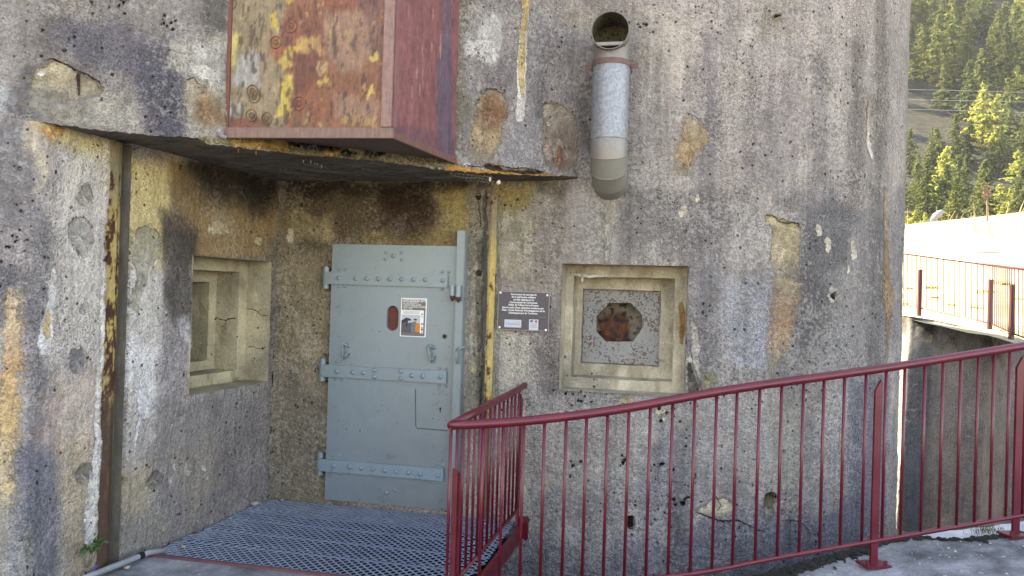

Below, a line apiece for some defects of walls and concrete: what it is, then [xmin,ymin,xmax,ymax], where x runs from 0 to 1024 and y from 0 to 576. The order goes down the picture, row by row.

spalling [31,58,103,99]
damp [515,0,530,122]
spalling [469,88,508,155]
spalling [541,103,578,166]
spalling [765,214,801,272]
spalling [697,492,777,532]